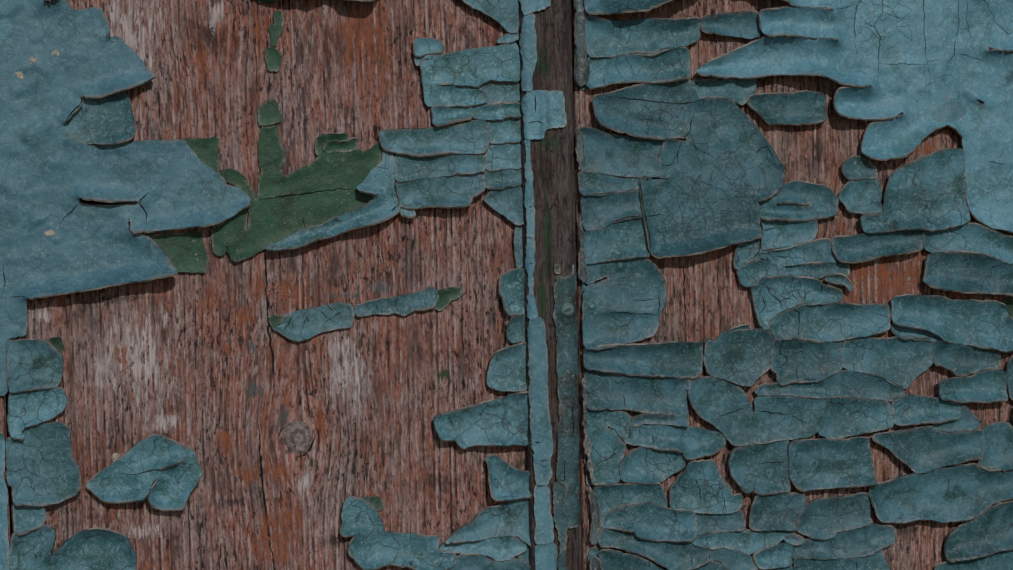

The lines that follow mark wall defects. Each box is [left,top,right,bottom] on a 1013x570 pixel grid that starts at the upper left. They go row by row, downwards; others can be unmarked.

peeling [0,0,581,570]
peeling [574,0,1013,570]
crack [840,0,1010,82]